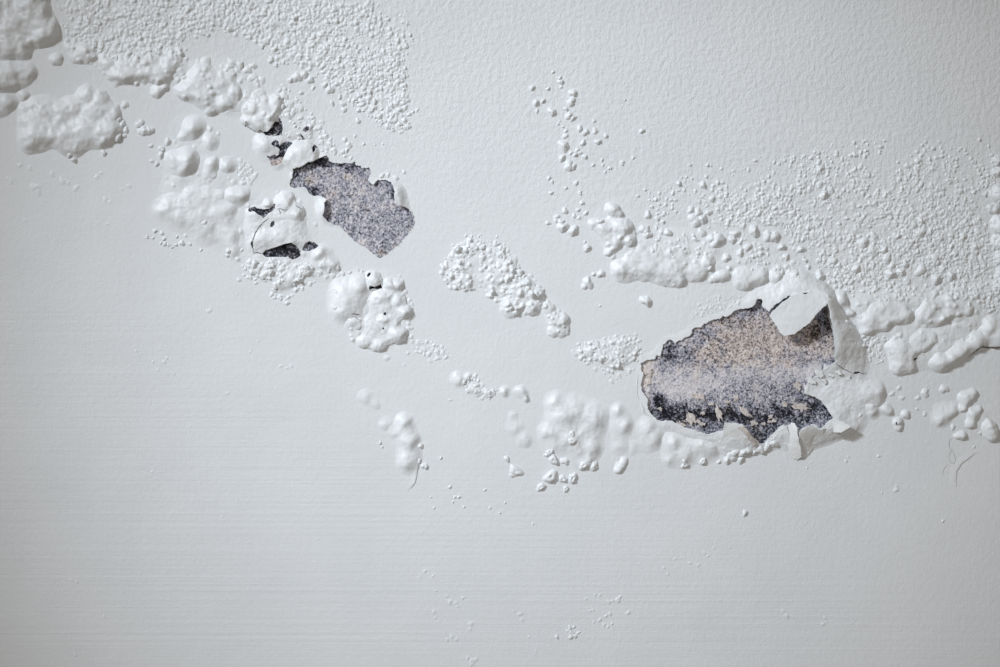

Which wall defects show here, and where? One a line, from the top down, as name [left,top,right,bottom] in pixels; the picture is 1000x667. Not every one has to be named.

peeling [289,152,415,258]
peeling [636,269,887,460]